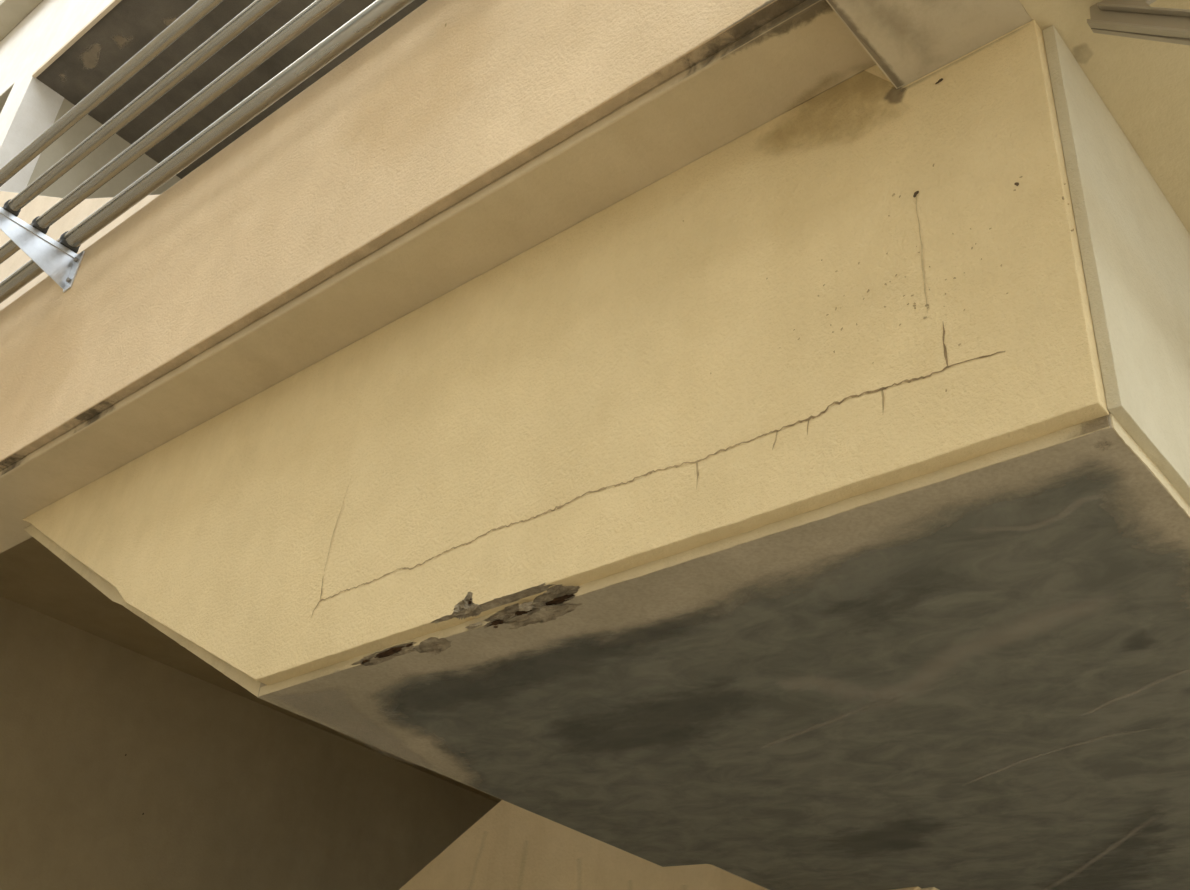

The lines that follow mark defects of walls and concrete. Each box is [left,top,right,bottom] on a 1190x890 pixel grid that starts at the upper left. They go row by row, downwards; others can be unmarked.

spalling [352,637,452,666]
spalling [431,582,582,630]
crack [311,191,1004,617]
water stain [384,471,1190,890]